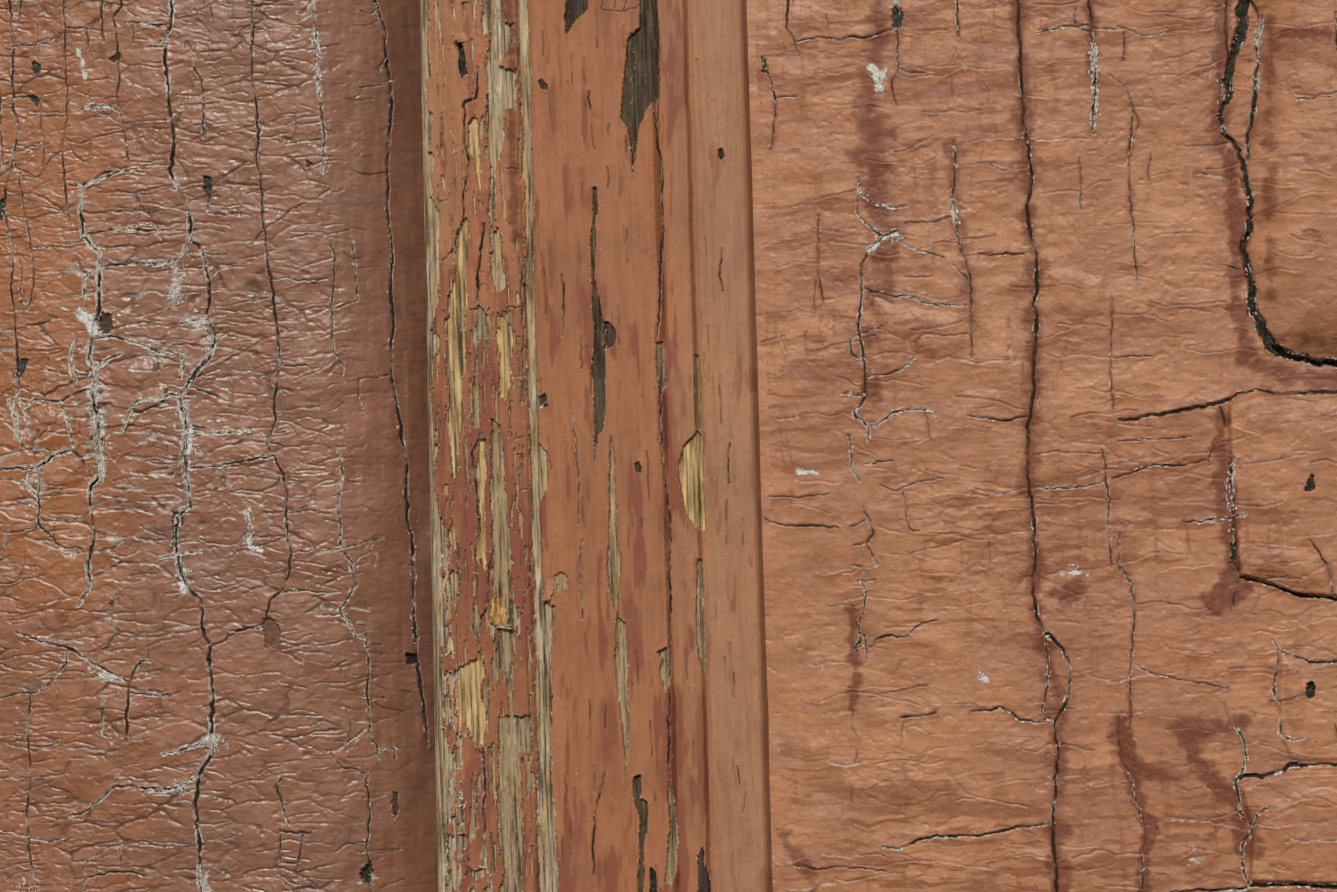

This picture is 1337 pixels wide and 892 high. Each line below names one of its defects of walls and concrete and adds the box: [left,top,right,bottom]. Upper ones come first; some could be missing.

peeling [564,0,588,35]
peeling [620,0,660,170]
crack [0,0,429,892]
peeling [405,0,568,892]
peeling [679,355,705,530]
crack [763,0,1337,892]
peeling [590,187,679,892]
peeling [695,557,707,675]
peeling [696,847,711,892]